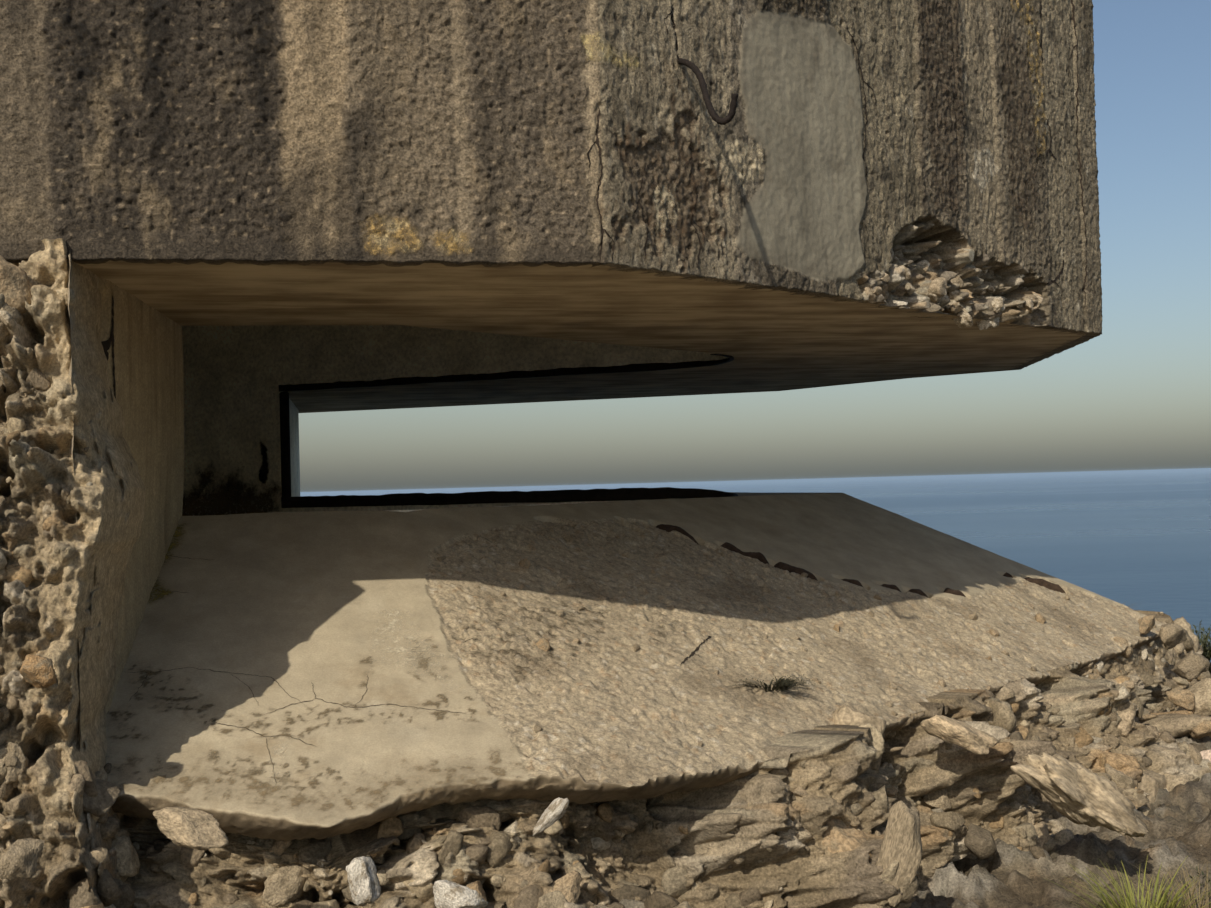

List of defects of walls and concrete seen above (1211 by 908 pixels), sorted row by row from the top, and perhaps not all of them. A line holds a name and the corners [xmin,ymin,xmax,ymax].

crack [664,8,678,60]
crack [587,107,615,261]
crack [633,178,649,257]
corrosion [647,80,726,243]
spalling [855,214,1049,330]
crack [1040,0,1088,305]
crack [129,667,461,783]
spalling [424,517,1164,787]